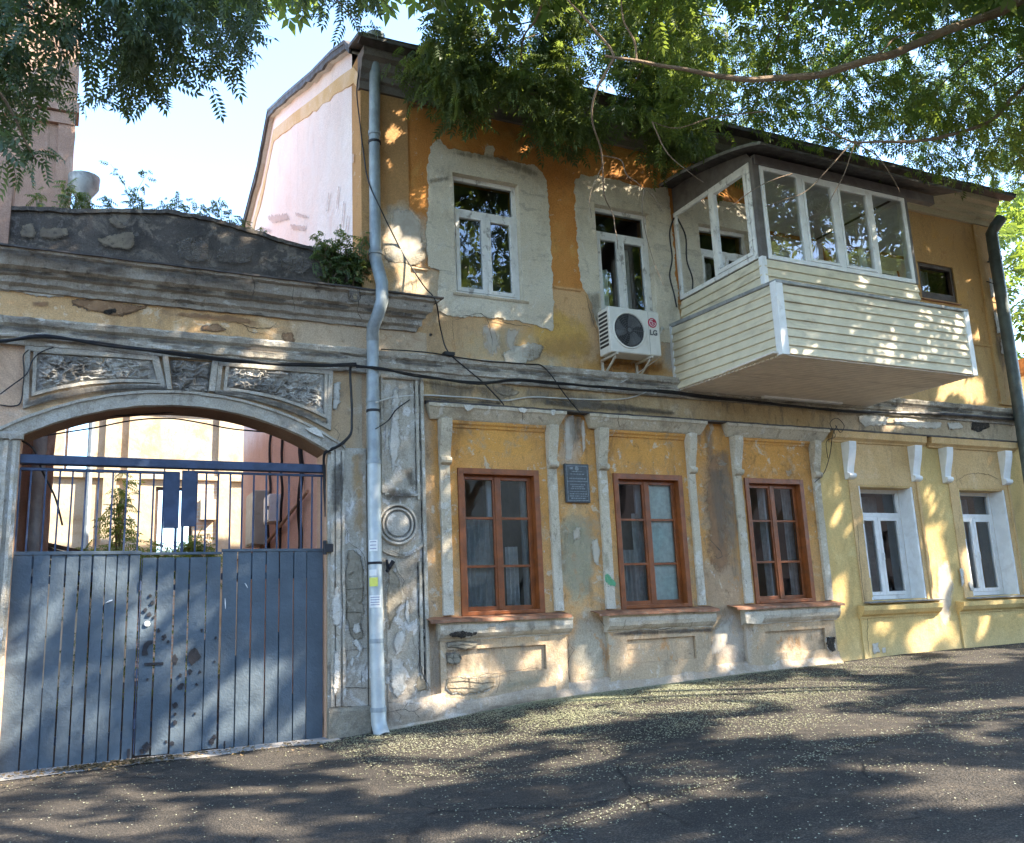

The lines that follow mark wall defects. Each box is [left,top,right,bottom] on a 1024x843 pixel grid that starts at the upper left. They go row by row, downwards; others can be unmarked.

flaking render [20,223,68,239]
flaking render [98,217,135,250]
flaking render [261,212,307,232]
flaking render [384,244,426,265]
flaking render [0,289,147,317]
flaking render [201,324,226,332]
flaking render [502,342,543,363]
flaking render [386,387,401,471]
flaking render [859,414,990,432]
water stain [706,456,731,572]
flaking render [331,548,365,695]
flaking render [386,567,429,698]